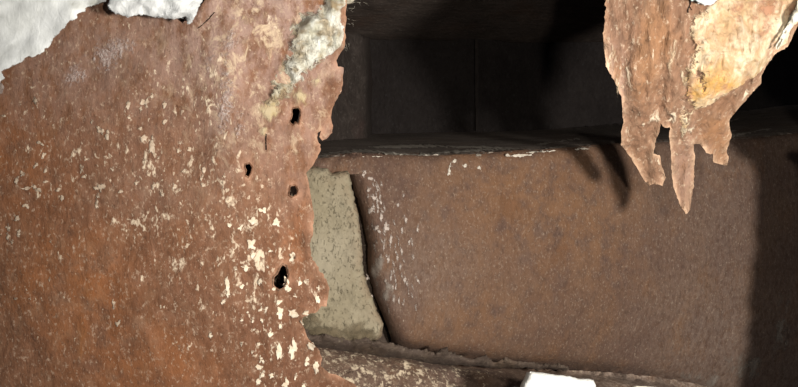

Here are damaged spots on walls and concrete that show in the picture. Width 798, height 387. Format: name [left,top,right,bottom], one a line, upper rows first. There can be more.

peeling [93,39,135,71]
peeling [126,93,154,119]
peeling [14,141,48,193]
peeling [138,127,159,162]
peeling [318,138,587,175]
peeling [5,204,29,244]
peeling [227,207,266,231]
peeling [221,239,256,304]
peeling [240,276,320,375]
peeling [251,342,274,385]